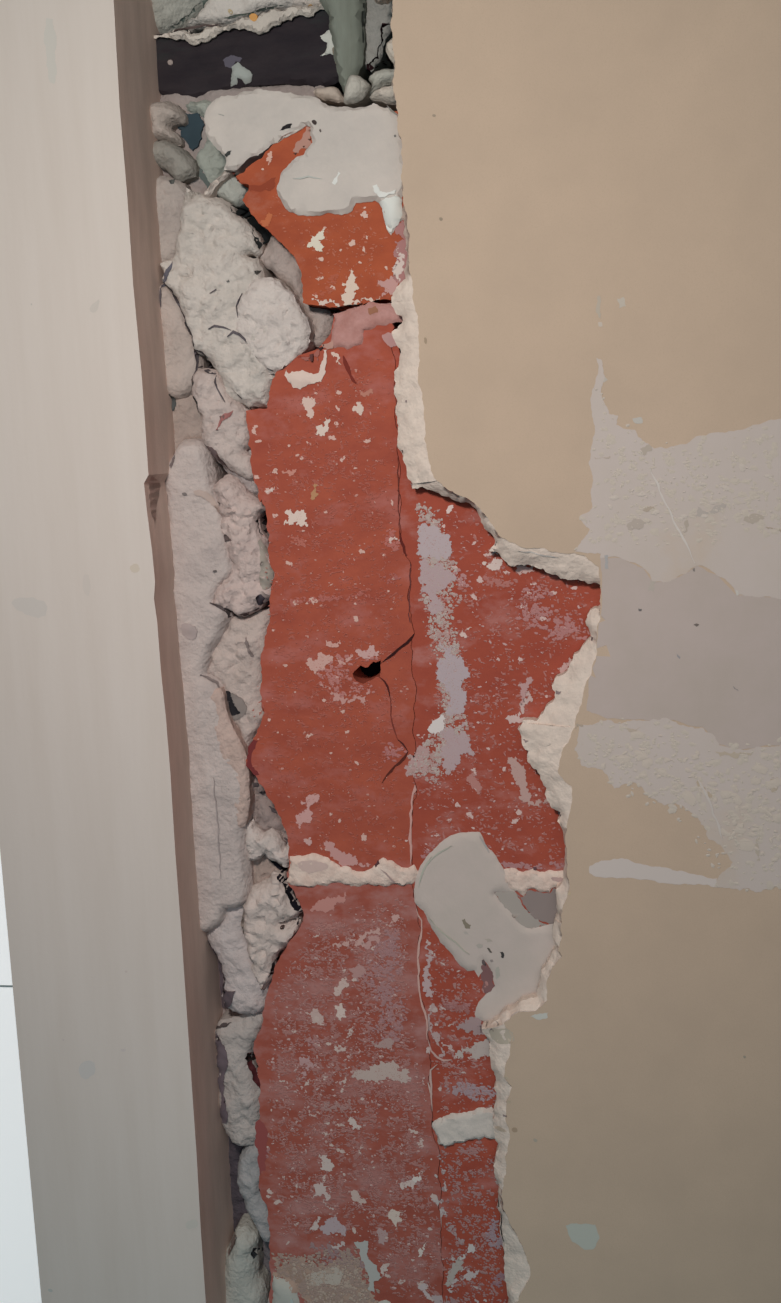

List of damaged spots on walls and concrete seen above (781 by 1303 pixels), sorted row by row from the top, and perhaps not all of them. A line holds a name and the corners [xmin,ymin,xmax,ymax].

flaking render [230,62,253,87]
flaking render [320,30,334,56]
flaking render [391,173,600,584]
crack [380,462,414,782]
flaking render [481,604,601,1303]